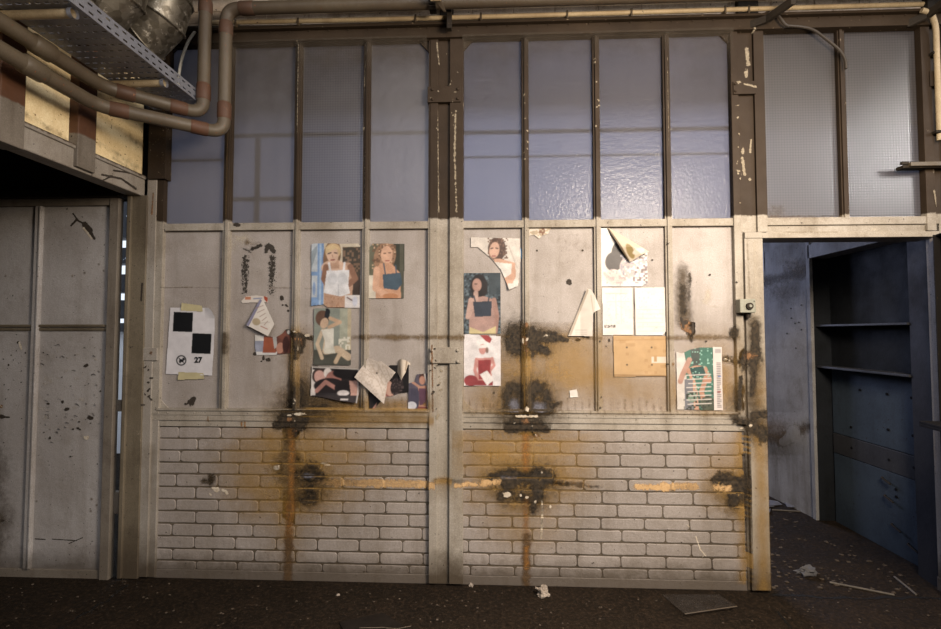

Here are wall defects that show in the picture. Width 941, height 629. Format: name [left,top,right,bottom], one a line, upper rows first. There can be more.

corrosion [248,417,332,581]
corrosion [474,430,569,586]